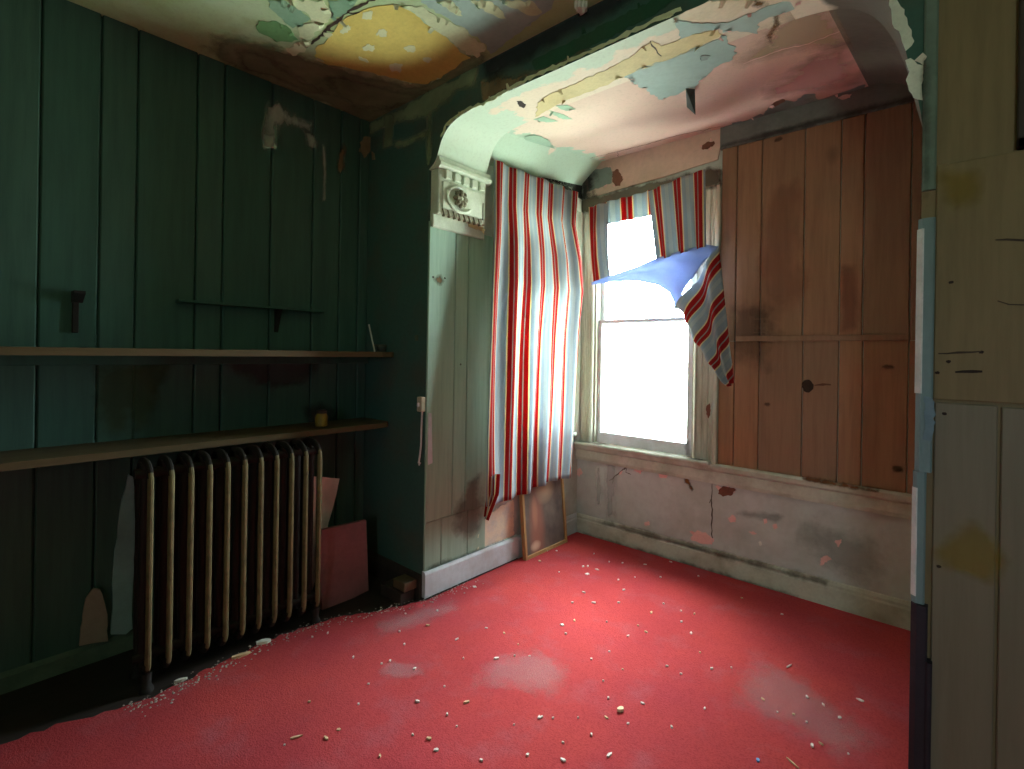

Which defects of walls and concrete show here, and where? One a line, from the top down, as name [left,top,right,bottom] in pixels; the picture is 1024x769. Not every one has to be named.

peeling [256,0,554,85]
peeling [440,0,802,137]
peeling [889,0,927,100]
leakage [217,39,585,166]
peeling [732,84,865,125]
peeling [524,135,555,149]
peeling [590,166,624,191]
flaking render [716,485,736,497]
peeling [690,530,714,544]
crack [707,494,715,538]